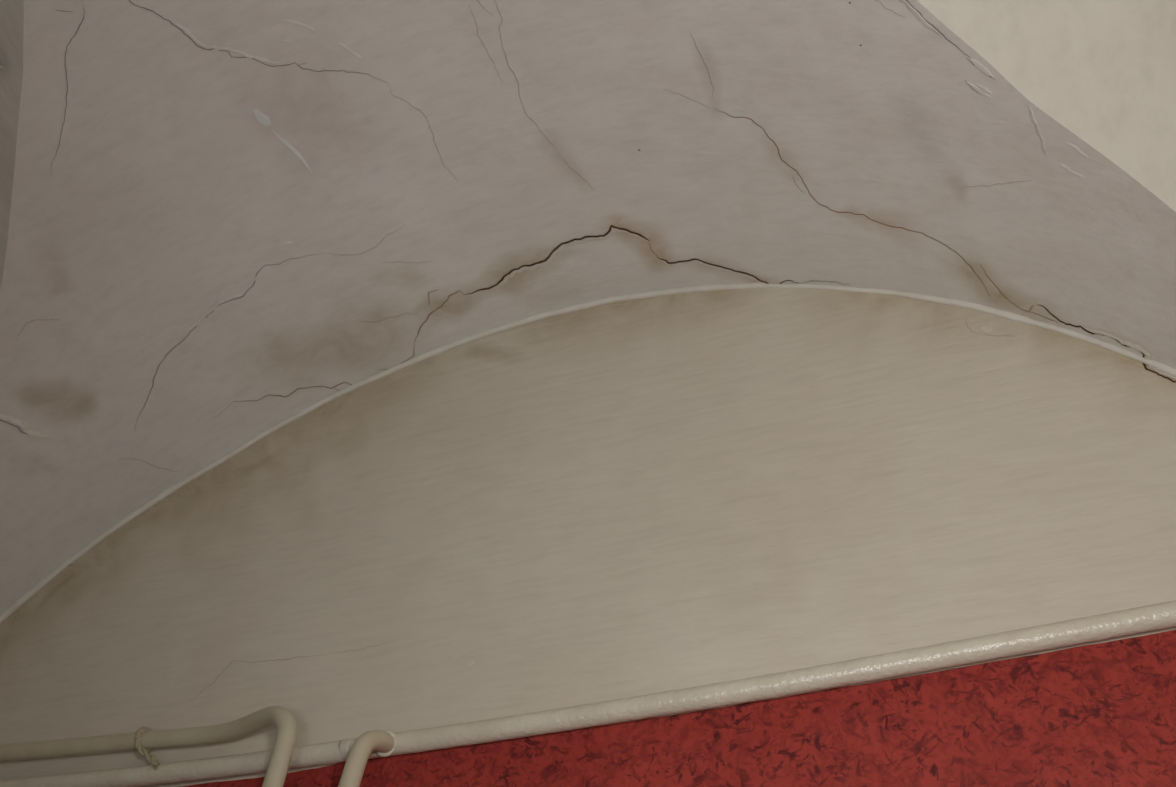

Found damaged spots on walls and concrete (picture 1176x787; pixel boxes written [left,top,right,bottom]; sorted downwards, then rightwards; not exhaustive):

crack [51,4,85,173]
crack [129,0,456,179]
crack [469,0,594,190]
crack [876,0,971,59]
crack [670,31,1176,383]
crack [129,228,430,471]
crack [356,225,851,370]